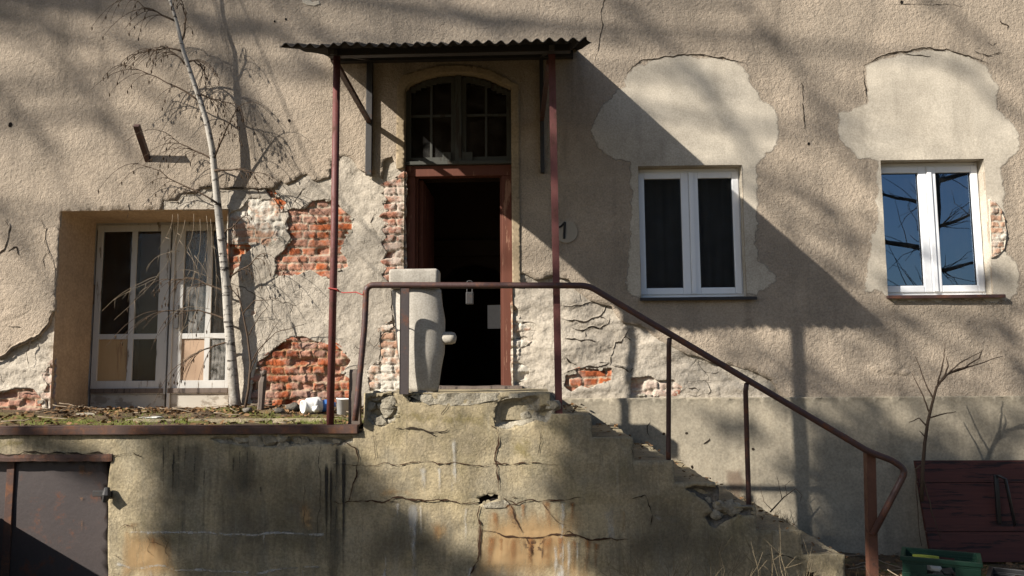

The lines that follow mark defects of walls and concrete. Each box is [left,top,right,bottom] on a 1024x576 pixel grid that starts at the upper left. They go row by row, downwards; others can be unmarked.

flaking render [988,199,1007,258]
peeling [0,310,59,411]
peeling [154,154,779,429]
crack [561,301,633,374]
water stain [309,449,345,546]
crack [303,404,624,574]
corrosion [487,503,598,569]
spalling [684,485,757,528]